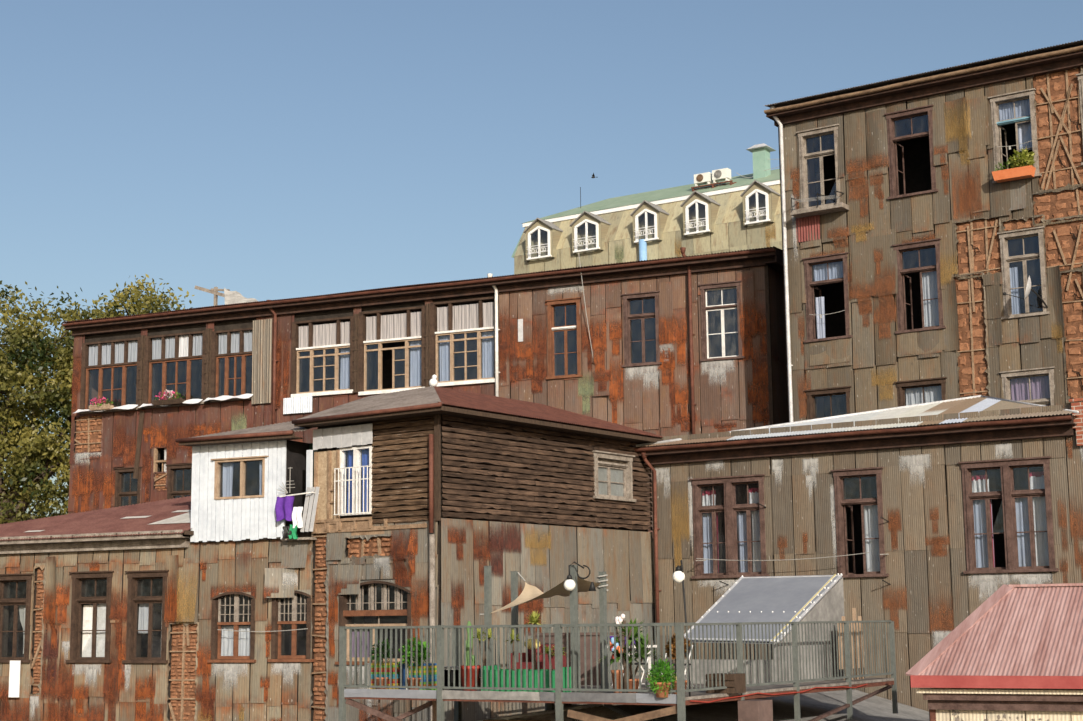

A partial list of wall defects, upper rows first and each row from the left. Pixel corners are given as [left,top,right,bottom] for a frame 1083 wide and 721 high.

rust [810,157,889,257]
rust [848,250,896,338]
rust [740,303,770,426]
rust [72,471,115,513]
rust [113,424,227,502]
damp [901,454,929,478]
rust [925,509,950,556]
rust [390,531,429,647]
rust [448,525,551,635]
rust [0,586,164,721]
damp [934,631,952,644]